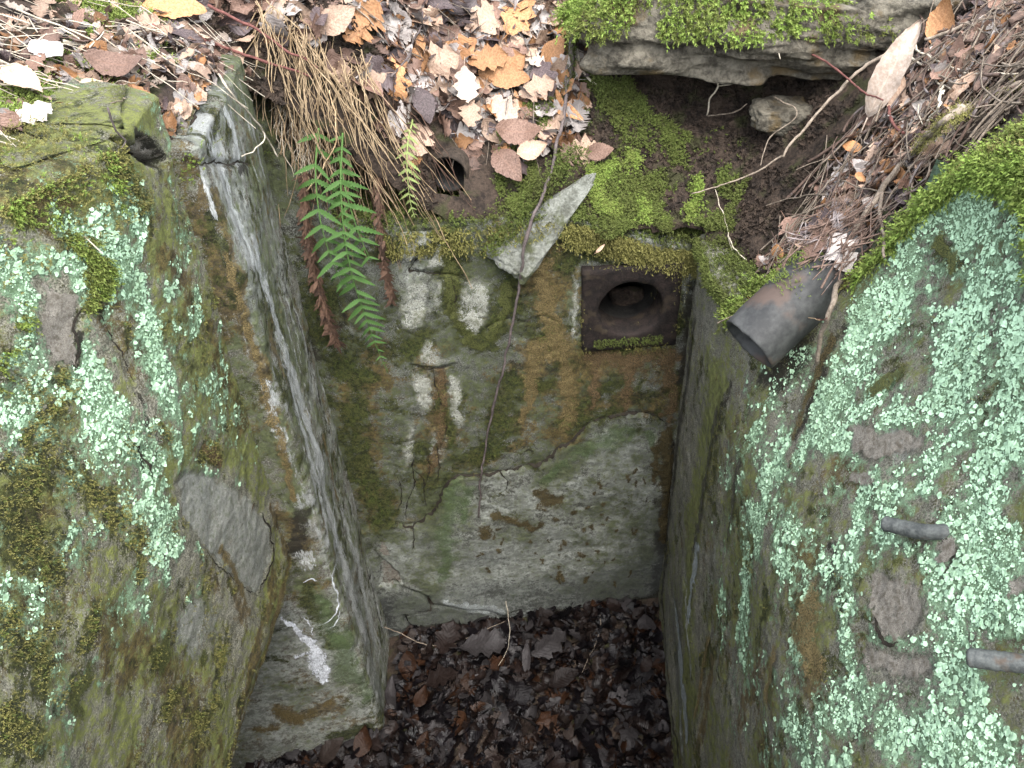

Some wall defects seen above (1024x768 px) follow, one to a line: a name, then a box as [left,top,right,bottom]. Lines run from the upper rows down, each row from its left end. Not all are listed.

leakage [223,106,240,160]
leakage [200,172,218,220]
leakage [448,281,514,352]
leakage [222,171,376,645]
crack [380,365,675,549]
crack [397,580,434,621]
leakage [280,617,333,684]